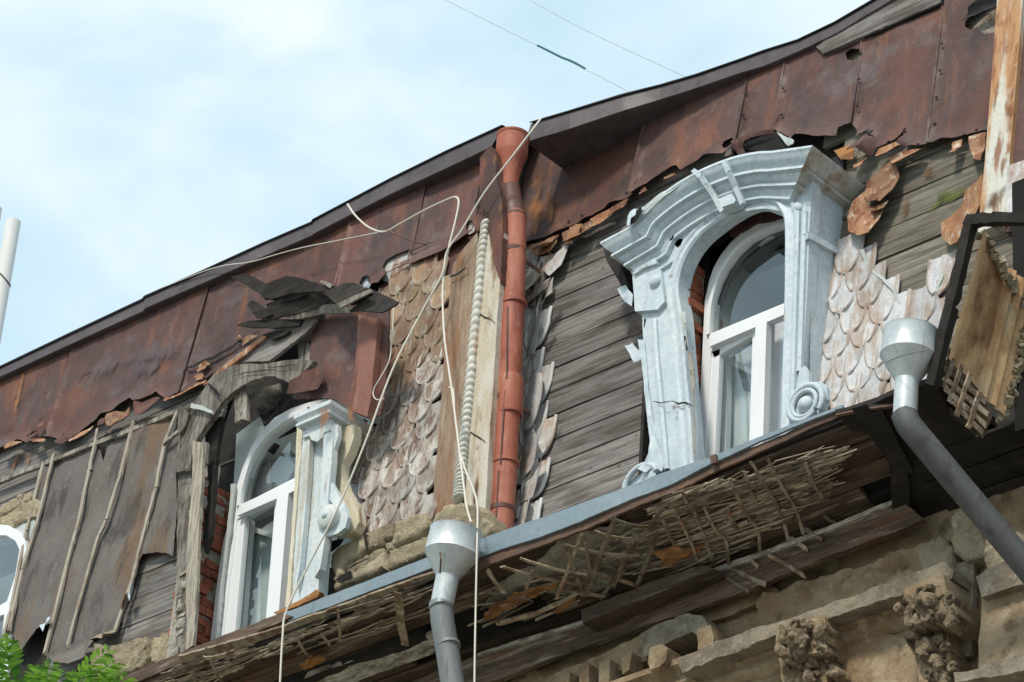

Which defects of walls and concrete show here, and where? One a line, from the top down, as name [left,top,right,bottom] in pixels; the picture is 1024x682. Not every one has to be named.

peeling [948,132,987,161]
peeling [532,186,647,250]
peeling [847,142,924,236]
peeling [941,174,983,246]
peeling [236,334,258,346]
peeling [3,361,211,450]
crack [652,401,692,409]
spalling [168,566,187,658]